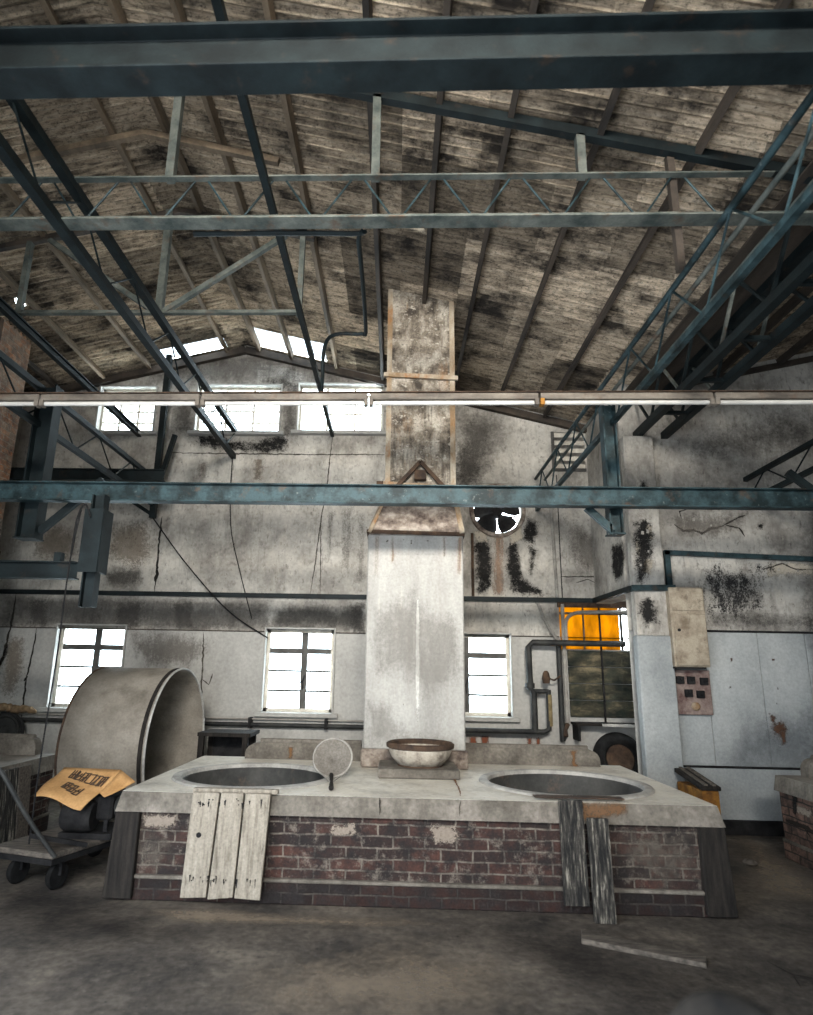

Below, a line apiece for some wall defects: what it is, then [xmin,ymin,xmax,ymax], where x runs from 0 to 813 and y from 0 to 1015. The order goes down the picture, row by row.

mould [174,406,297,453]
crack [674,509,745,537]
crack [0,595,16,665]
mould [474,540,492,594]
mould [505,518,547,597]
mould [638,597,660,628]
damp [703,564,775,624]
crack [21,628,37,717]
corrosion [769,703,788,745]